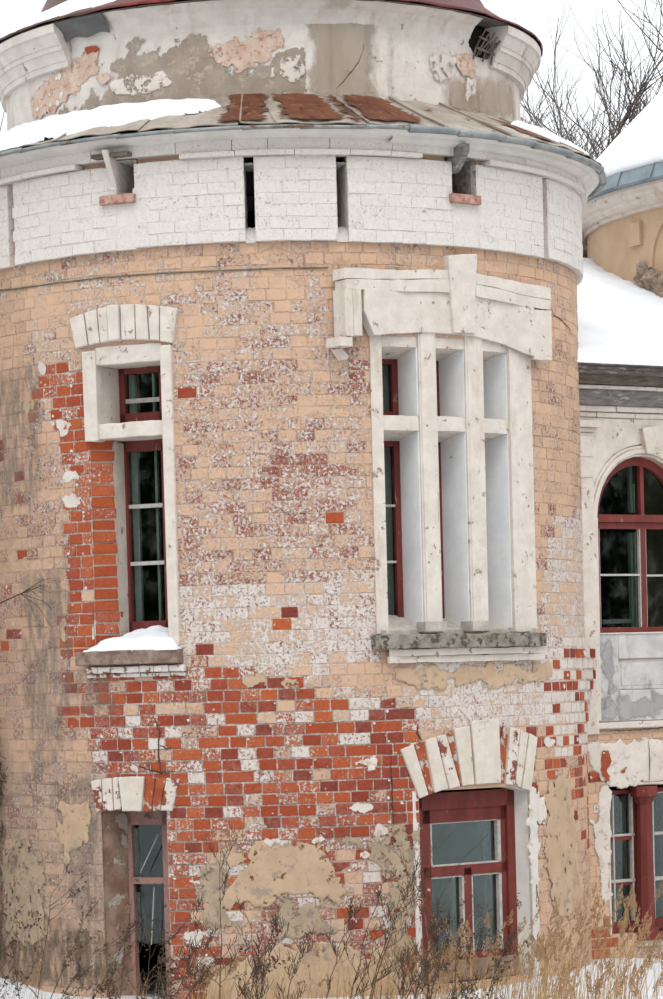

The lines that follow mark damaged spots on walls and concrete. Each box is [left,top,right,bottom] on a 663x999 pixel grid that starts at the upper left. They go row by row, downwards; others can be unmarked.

flaking render [30,28,307,120]
spalling [430,27,501,102]
corrosion [218,93,421,128]
spalling [178,386,196,398]
peeling [19,361,123,659]
spalling [326,512,350,523]
spalling [272,607,298,633]
spalling [193,643,214,655]
flaking render [383,661,553,691]
peeling [55,667,431,999]
flaking render [525,727,663,959]